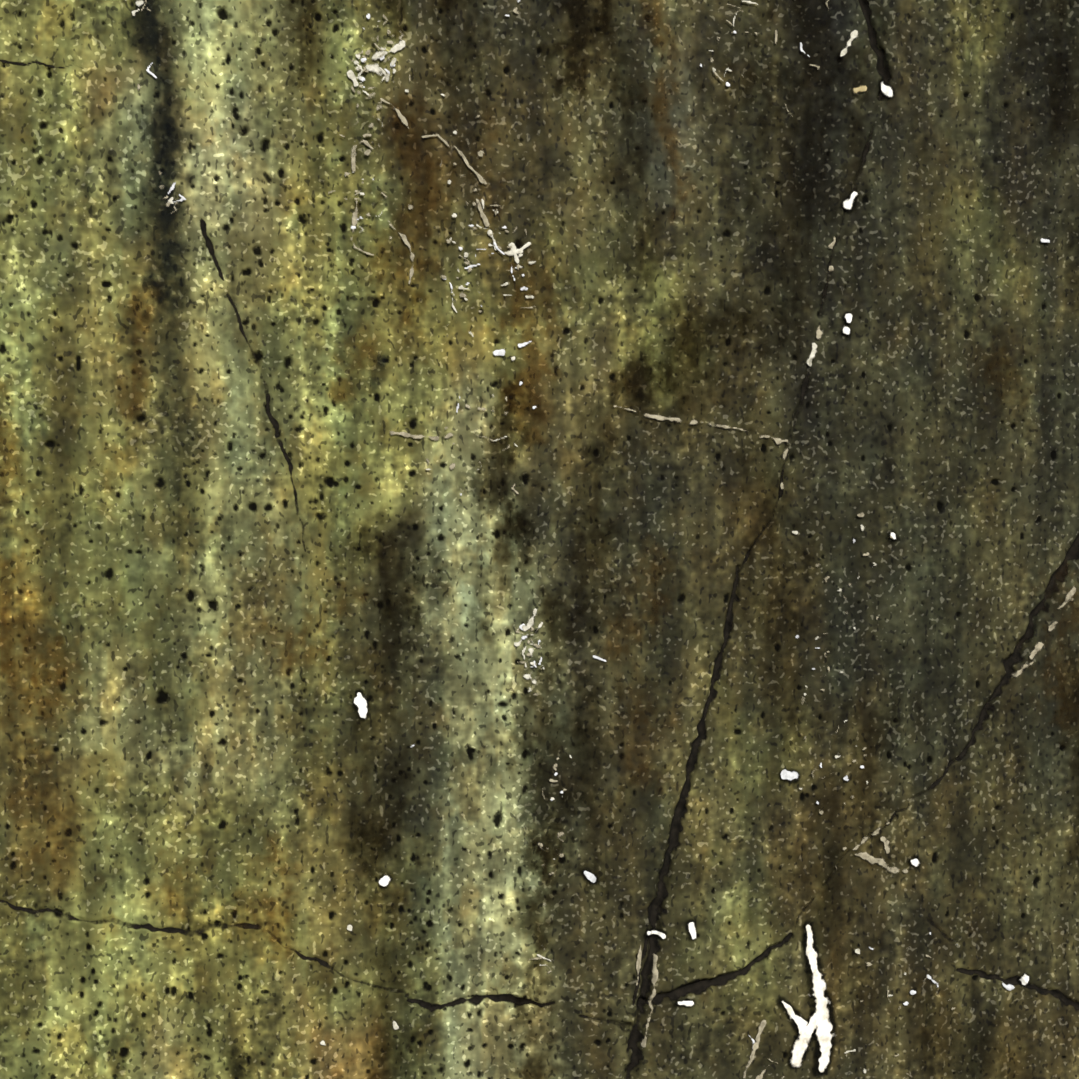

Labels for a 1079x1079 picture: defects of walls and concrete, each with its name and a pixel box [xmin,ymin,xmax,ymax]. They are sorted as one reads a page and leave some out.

crack [0,60,65,68]
crack [859,0,892,101]
crack [200,219,253,352]
crack [820,132,872,309]
crack [264,381,306,552]
crack [579,366,830,1079]
crack [929,535,1079,789]
crack [0,900,555,1012]
crack [956,968,1079,1011]